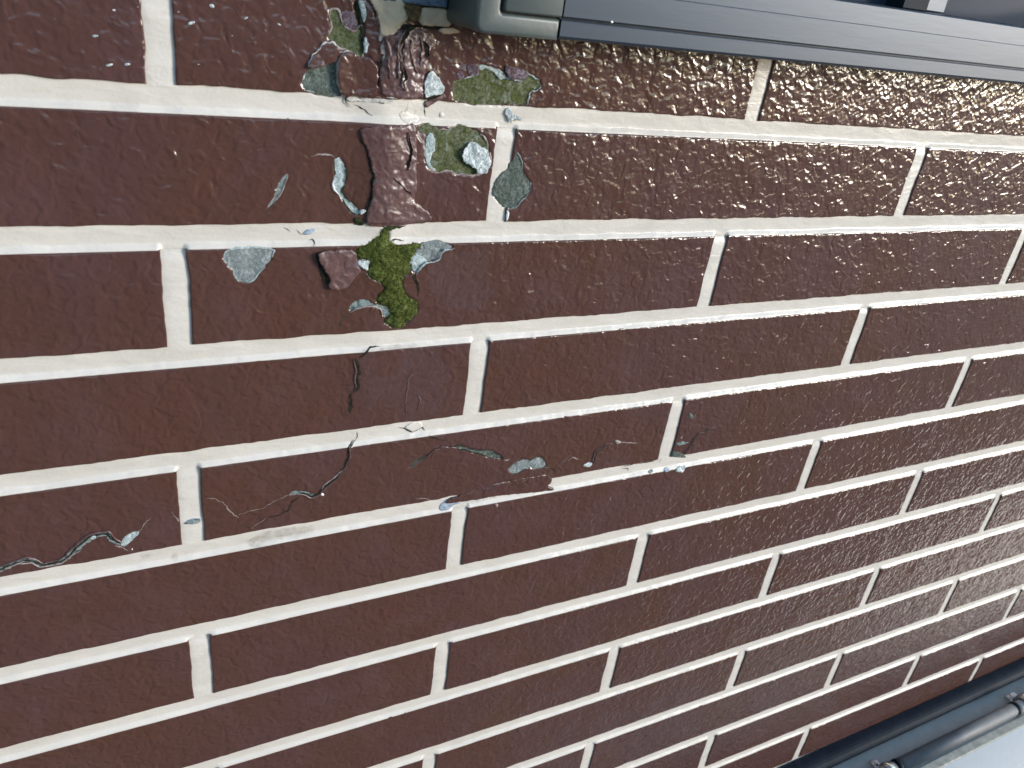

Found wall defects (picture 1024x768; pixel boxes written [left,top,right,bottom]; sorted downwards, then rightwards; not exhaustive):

peeling [301,0,460,104]
peeling [424,63,541,123]
peeling [314,153,366,226]
peeling [417,122,531,221]
peeling [223,246,275,283]
peeling [285,228,370,291]
peeling [410,240,454,275]
peeling [340,299,390,330]
crack [210,346,379,529]
crack [399,422,510,467]
peeling [509,457,548,474]
crack [0,518,151,572]